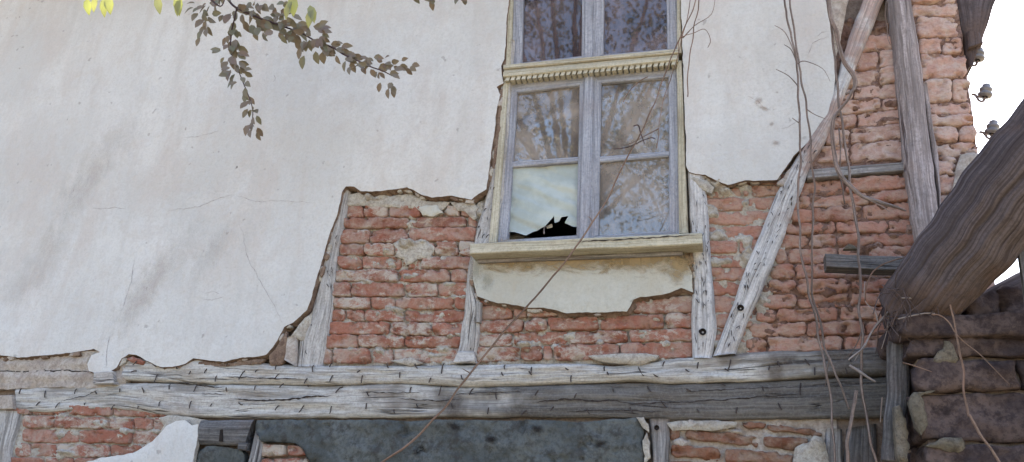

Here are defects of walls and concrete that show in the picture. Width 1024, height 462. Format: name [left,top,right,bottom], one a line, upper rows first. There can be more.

spalling [0,349,99,373]
spalling [112,0,510,371]